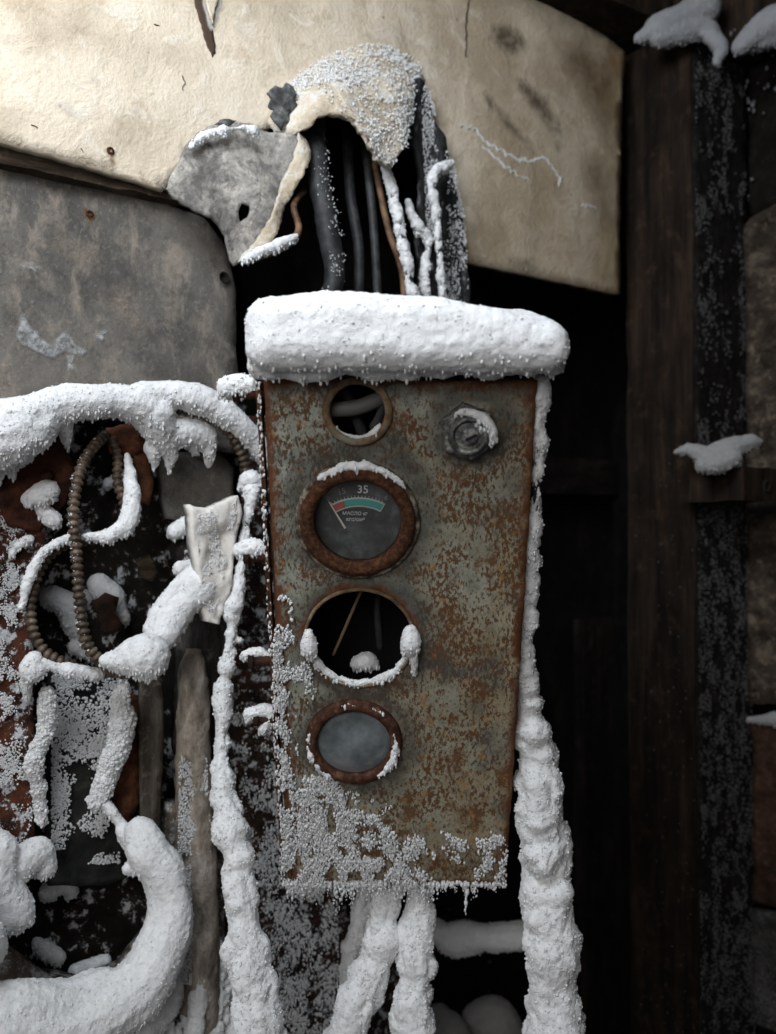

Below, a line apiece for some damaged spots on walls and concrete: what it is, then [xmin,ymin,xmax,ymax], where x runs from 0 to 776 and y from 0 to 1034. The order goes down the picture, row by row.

peeling [161,119,311,266]
rust [105,423,154,505]
rust [92,593,125,634]